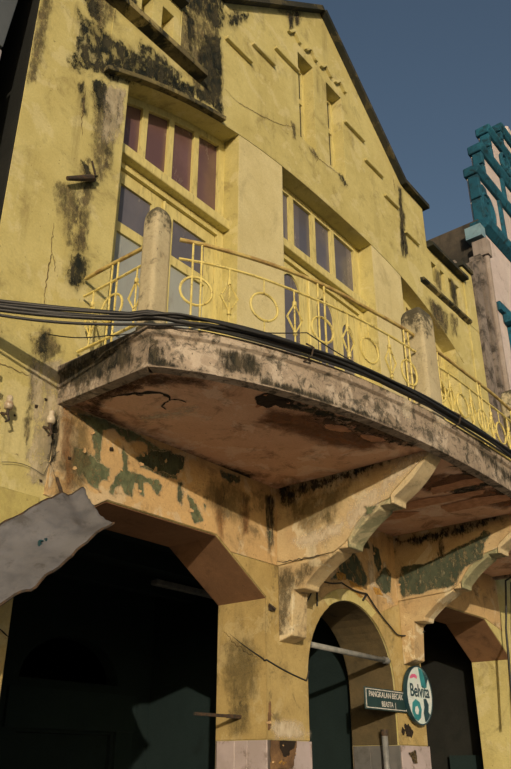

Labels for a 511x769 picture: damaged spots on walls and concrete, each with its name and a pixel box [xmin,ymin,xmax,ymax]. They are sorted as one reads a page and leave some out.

damp [56,0,249,288]
damp [398,188,408,256]
crack [44,228,56,304]
crack [112,391,185,409]
spalling [255,393,295,408]
peeling [68,413,206,523]
damp [219,348,424,549]
peeling [331,530,491,598]
peeling [402,724,413,738]